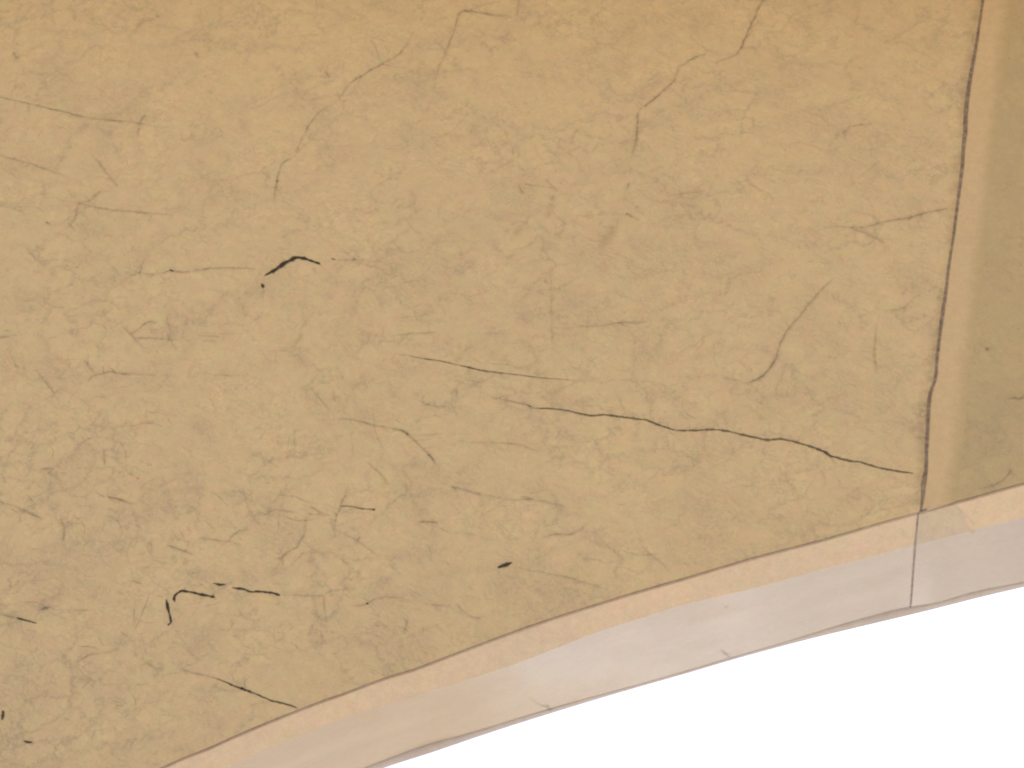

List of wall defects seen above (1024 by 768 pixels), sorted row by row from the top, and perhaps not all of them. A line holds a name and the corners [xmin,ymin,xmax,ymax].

crack [261,256,335,288]
crack [537,408,914,474]
crack [161,483,1024,768]